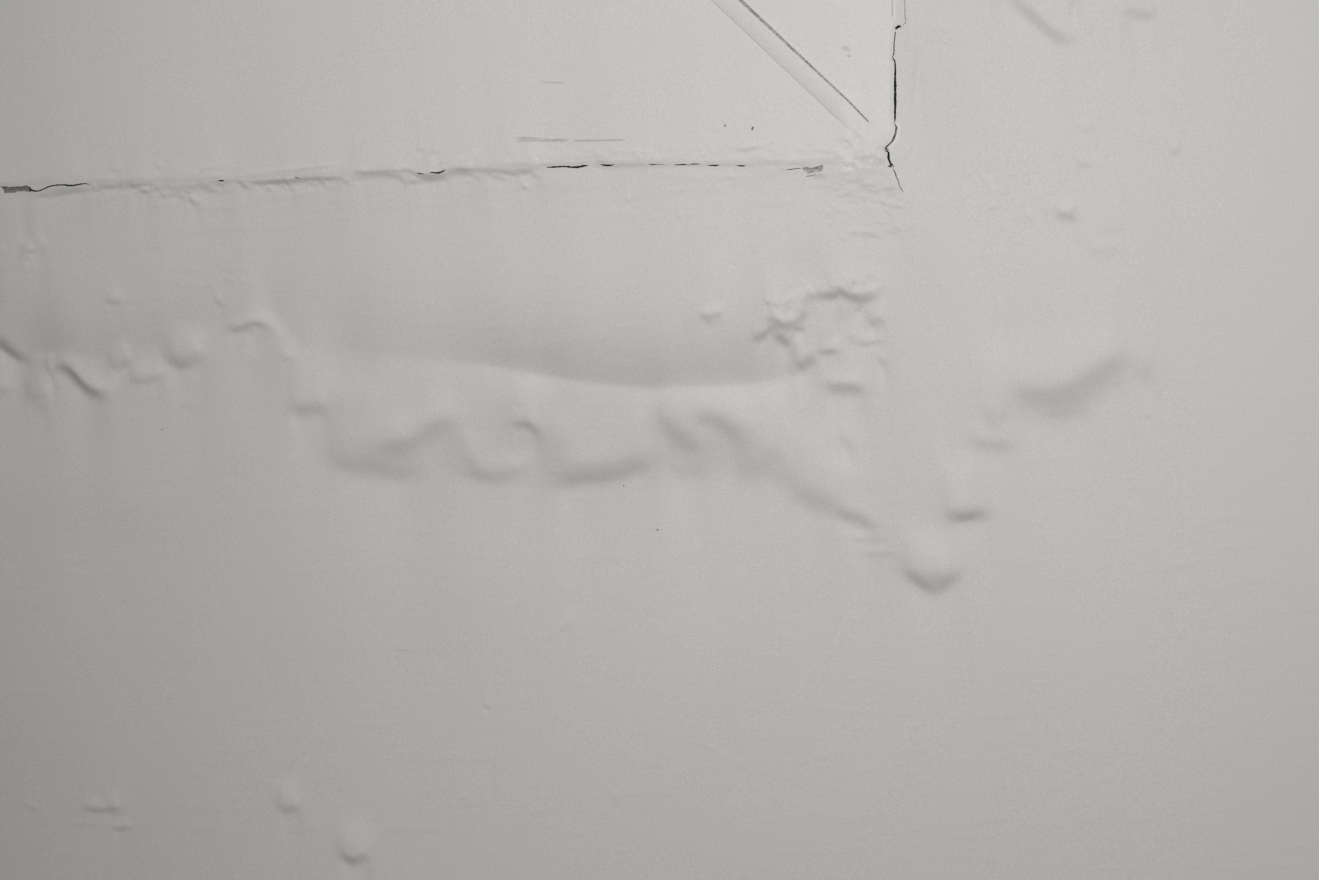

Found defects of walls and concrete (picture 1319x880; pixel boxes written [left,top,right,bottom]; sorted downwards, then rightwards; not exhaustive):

crack [881,25,909,198]
crack [412,165,451,178]
crack [542,160,750,172]
crack [782,164,826,181]
crack [0,180,94,195]